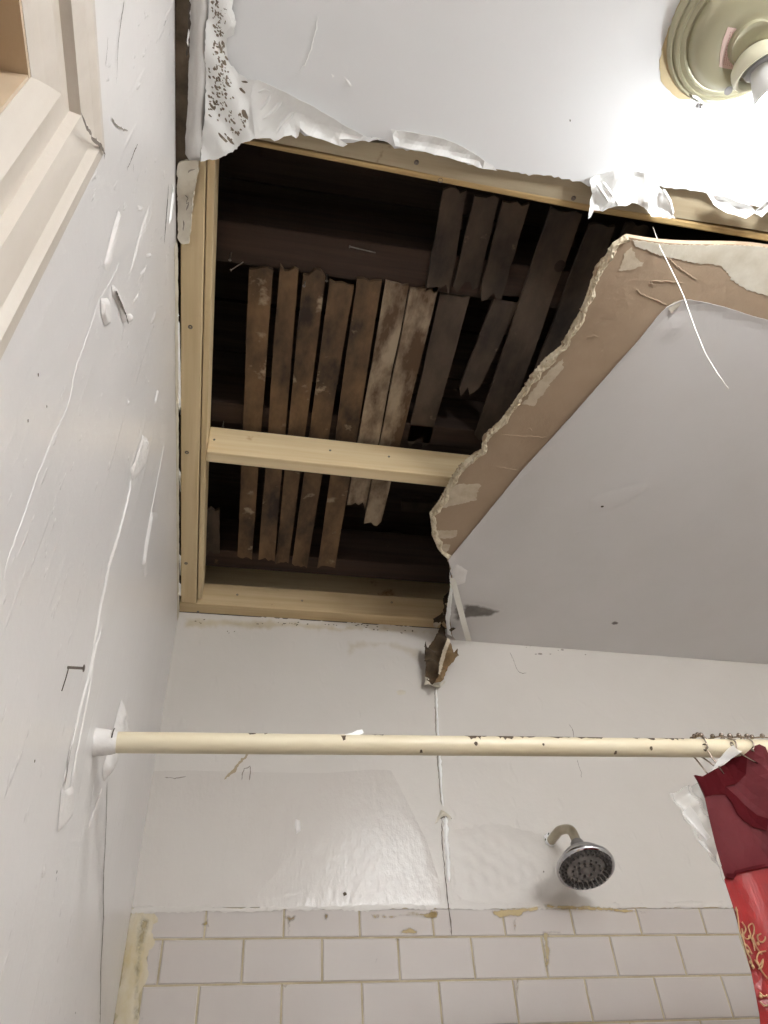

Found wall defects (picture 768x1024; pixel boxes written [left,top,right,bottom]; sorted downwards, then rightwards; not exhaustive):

peeling [588,168,675,219]
peeling [708,194,768,219]
spalling [429,235,630,559]
peeling [445,575,453,637]
crack [434,688,452,935]